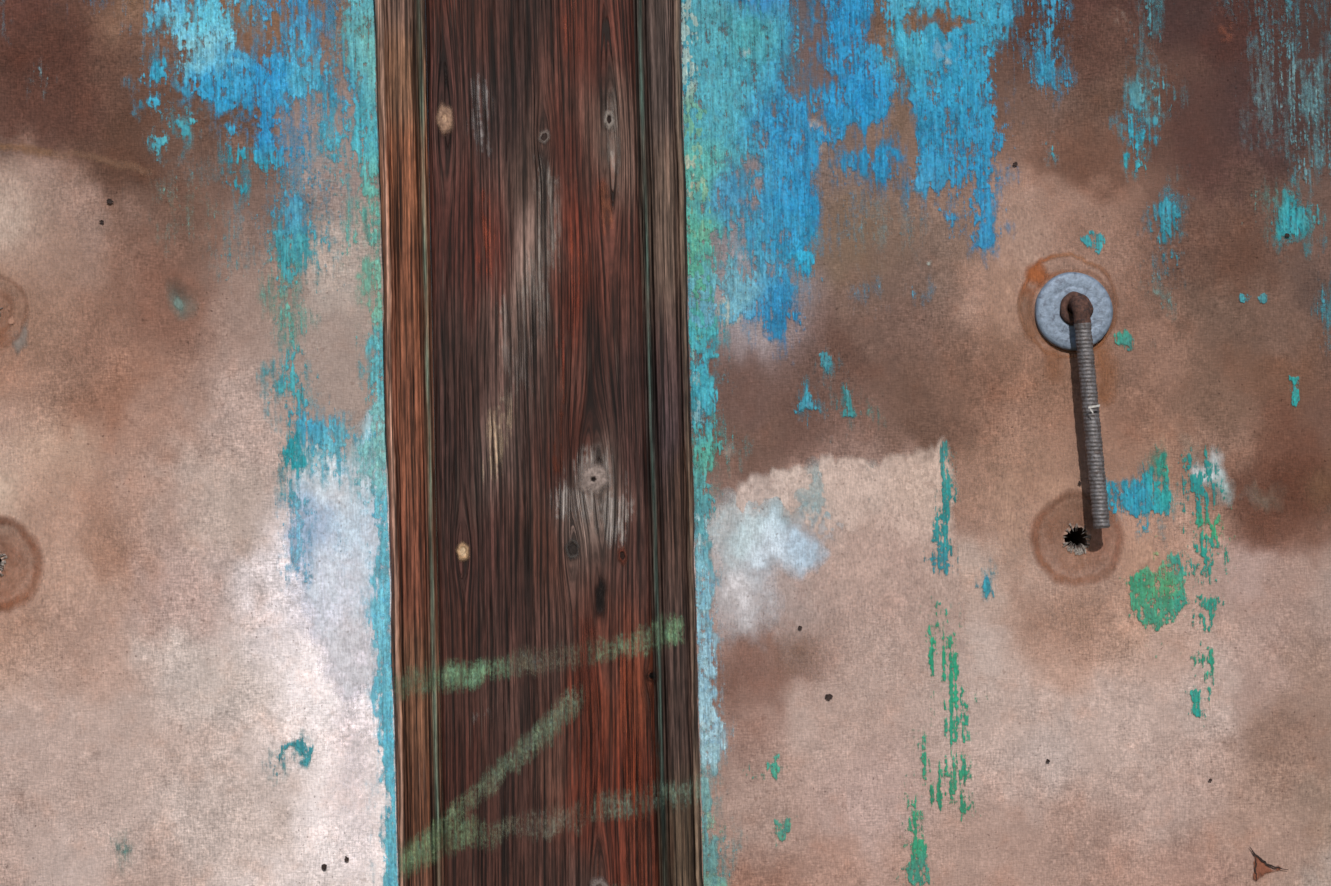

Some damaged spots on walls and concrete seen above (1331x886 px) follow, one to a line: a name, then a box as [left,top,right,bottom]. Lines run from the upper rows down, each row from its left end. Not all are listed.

peeling [1124,63,1175,172]
peeling [1254,0,1331,244]
corrosion [1018,253,1118,357]
peeling [1080,230,1105,254]
peeling [1150,194,1181,306]
peeling [1239,293,1267,303]
peeling [139,0,398,886]
peeling [681,0,1073,886]
peeling [1289,375,1300,407]
peeling [1106,445,1232,717]